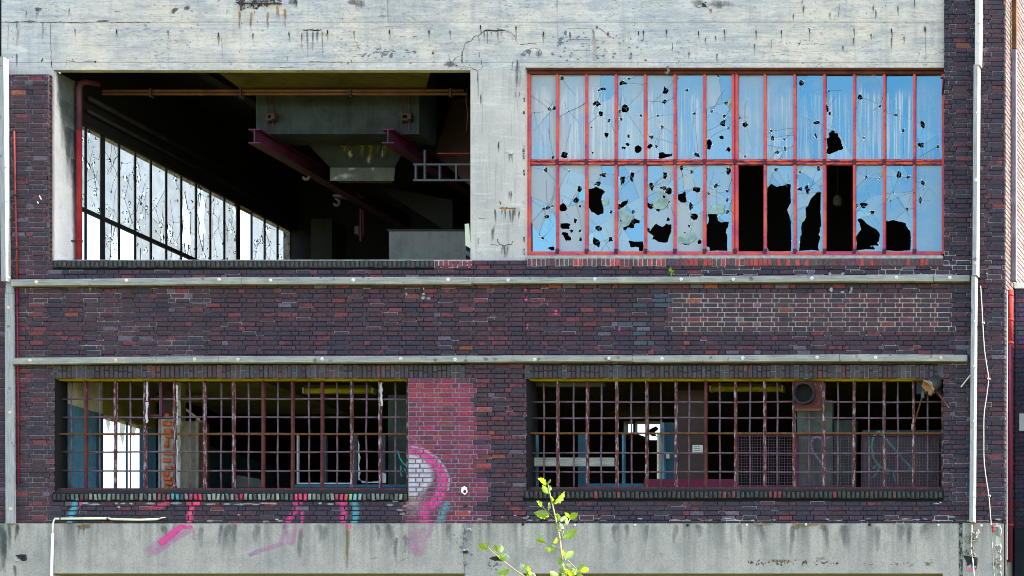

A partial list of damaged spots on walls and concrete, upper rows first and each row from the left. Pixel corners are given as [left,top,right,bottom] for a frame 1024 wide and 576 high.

crack [461,28,542,104]
damp [0,525,18,553]